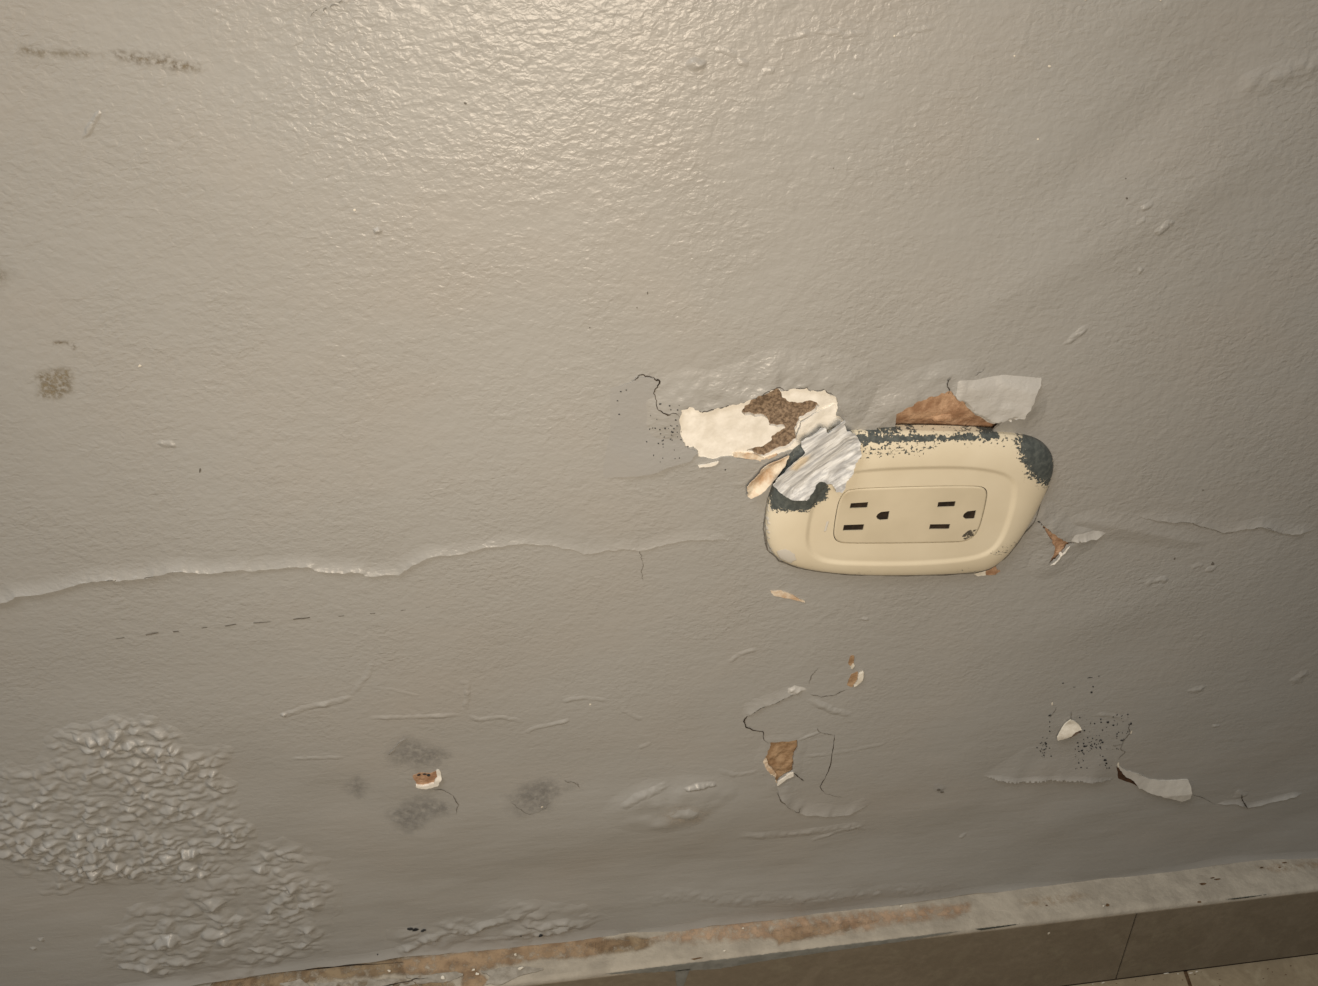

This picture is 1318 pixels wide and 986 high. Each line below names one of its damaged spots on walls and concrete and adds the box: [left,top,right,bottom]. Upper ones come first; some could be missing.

peeling [603,348,1047,501]
flaking render [413,769,442,789]
peeling [743,655,888,817]
peeling [984,702,1192,802]